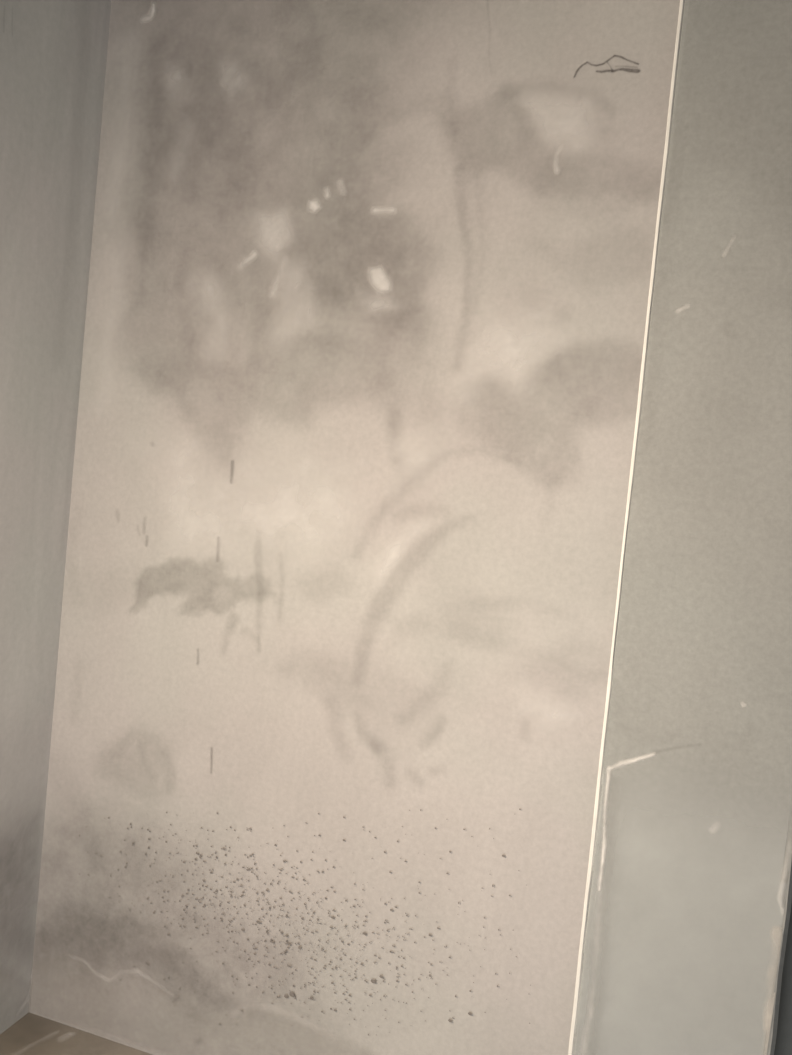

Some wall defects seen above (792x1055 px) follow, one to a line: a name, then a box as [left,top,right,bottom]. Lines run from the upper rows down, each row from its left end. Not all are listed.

damp [373,271,388,290]